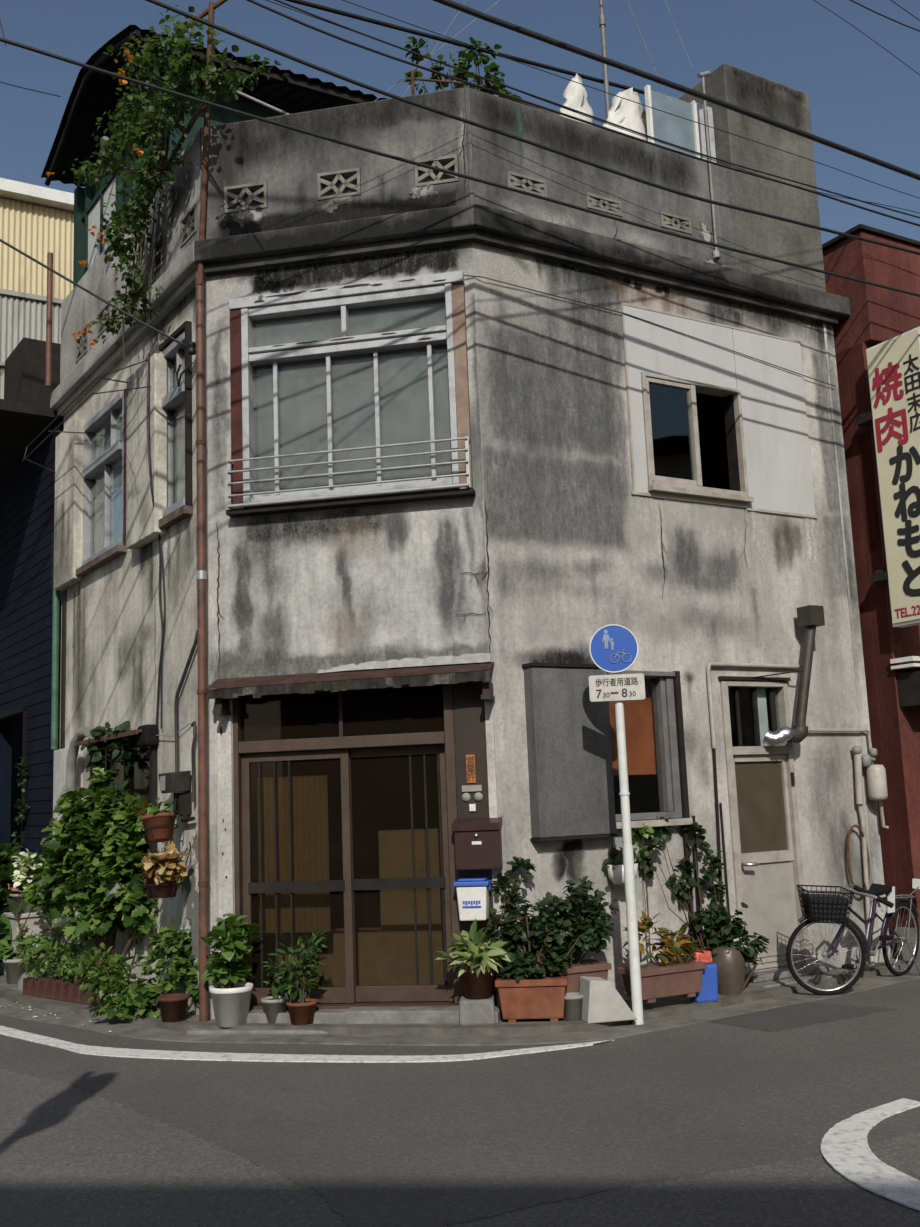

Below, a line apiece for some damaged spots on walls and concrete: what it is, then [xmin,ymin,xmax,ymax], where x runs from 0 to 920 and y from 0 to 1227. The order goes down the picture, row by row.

leakage [733,68,802,122]
leakage [487,215,718,282]
leakage [714,300,834,378]
leakage [468,259,656,578]
leakage [215,510,486,680]
leakage [673,536,734,587]